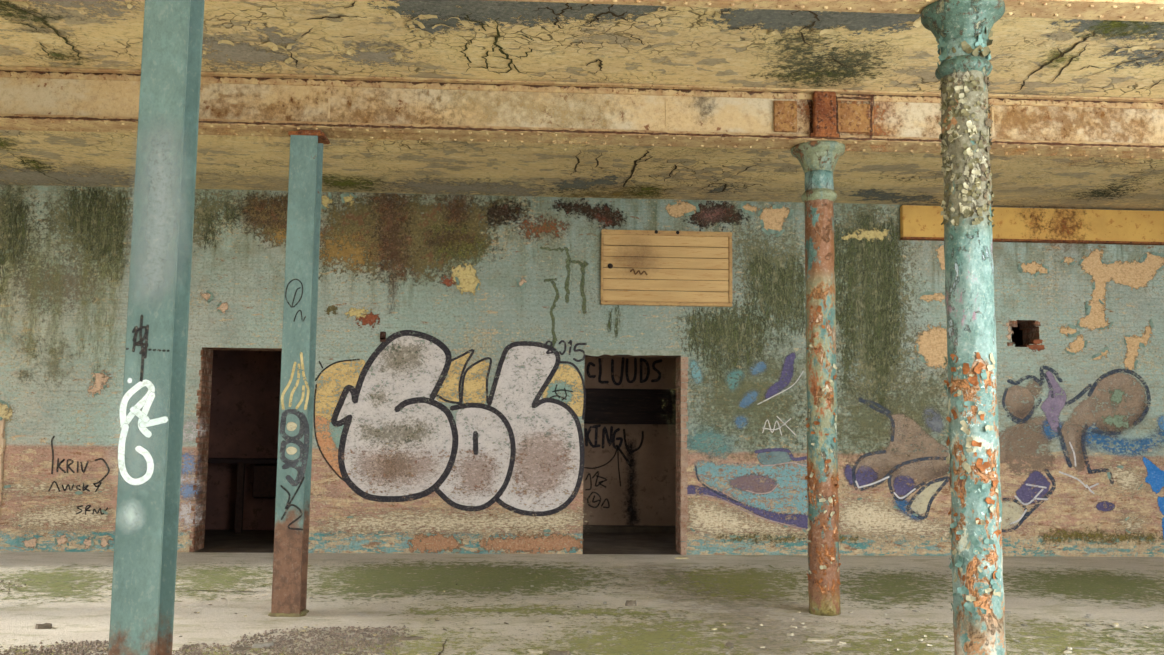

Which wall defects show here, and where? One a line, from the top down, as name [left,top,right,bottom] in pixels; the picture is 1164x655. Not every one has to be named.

peeling [202,21,307,70]
crack [459,3,644,74]
peeling [936,25,995,228]
crack [571,151,602,174]
crack [623,149,681,187]
crack [702,164,763,193]
water stain [0,164,135,384]
water stain [319,172,641,347]
water stain [685,252,806,380]
spalling [1005,318,1045,352]
peeling [1018,247,1164,360]
peeling [1122,319,1155,372]